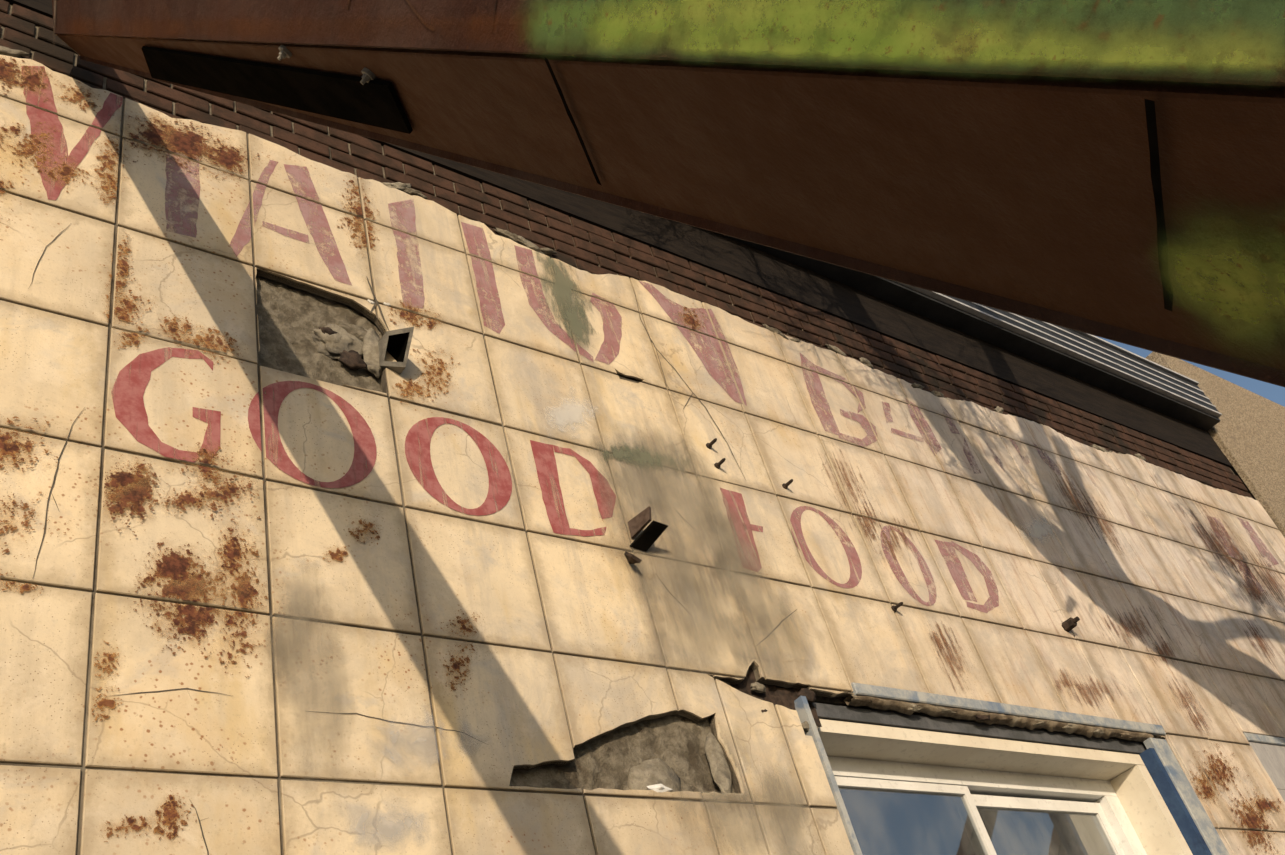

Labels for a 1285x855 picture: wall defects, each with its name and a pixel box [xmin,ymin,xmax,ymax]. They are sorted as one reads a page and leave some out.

corrosion [0,57,265,204]
corrosion [96,230,245,367]
peeling [255,275,391,392]
corrosion [0,414,74,600]
corrosion [88,441,271,678]
corrosion [100,789,197,849]
spalling [509,714,736,794]
corrosion [1168,679,1211,729]
corrosion [1189,743,1282,855]